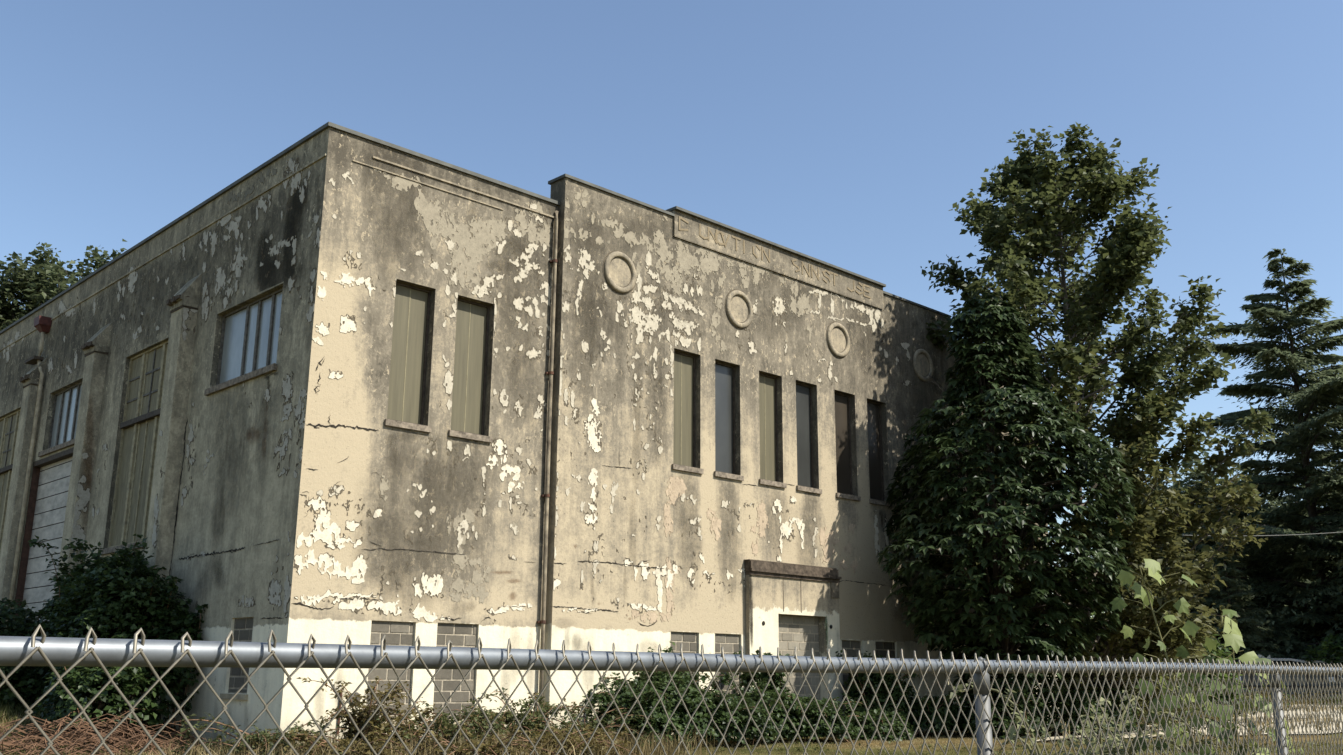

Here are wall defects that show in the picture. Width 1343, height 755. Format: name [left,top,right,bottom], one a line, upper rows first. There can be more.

damp [257,186,307,291]
peeling [170,157,406,346]
crack [302,356,379,516]
peeling [238,167,912,624]